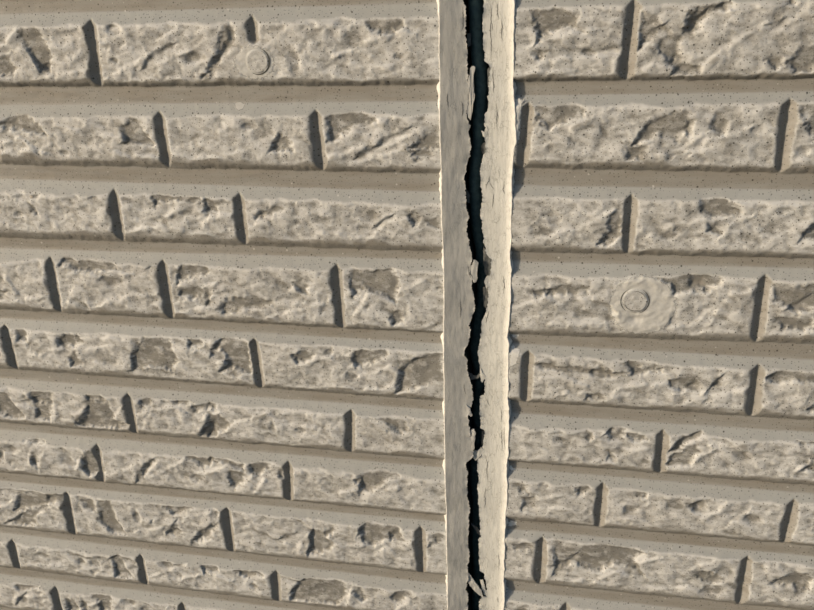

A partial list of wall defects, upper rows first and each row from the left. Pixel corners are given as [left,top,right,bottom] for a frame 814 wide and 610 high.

crack [447,0,505,610]